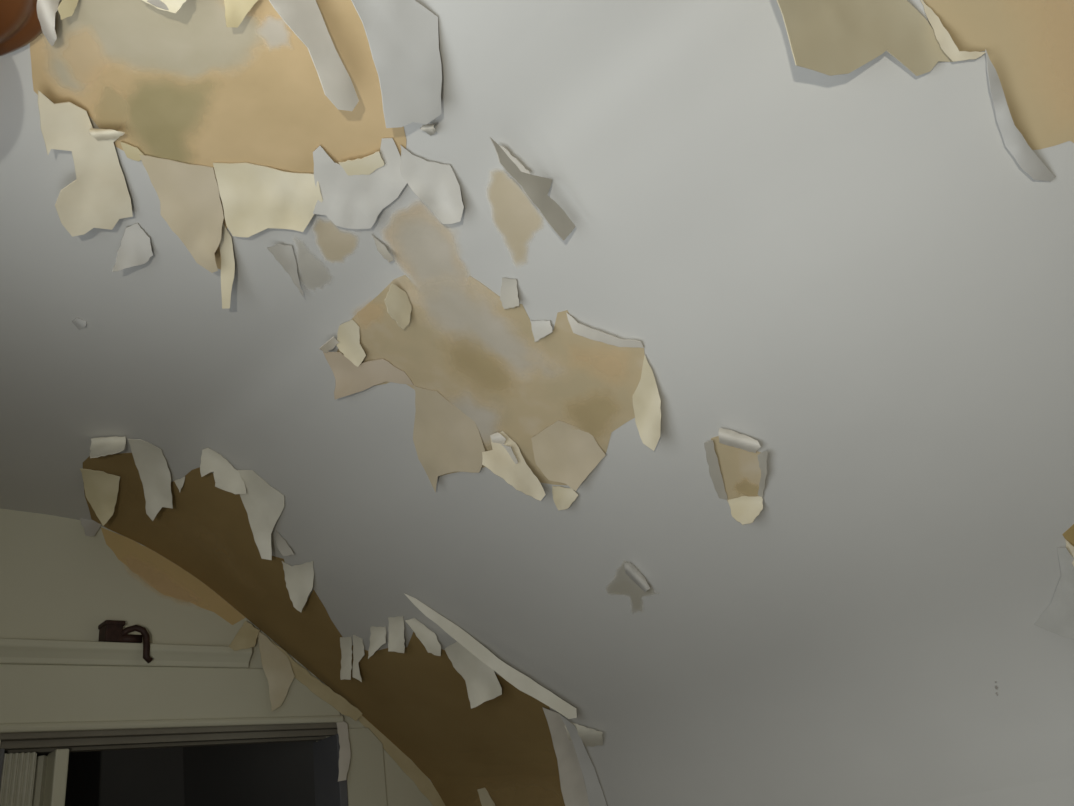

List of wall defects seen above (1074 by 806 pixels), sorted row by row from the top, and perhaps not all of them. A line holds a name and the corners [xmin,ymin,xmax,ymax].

peeling [777,0,1074,182]
peeling [30,0,661,511]
peeling [704,428,768,525]
peeling [80,436,607,806]
peeling [607,562,654,612]